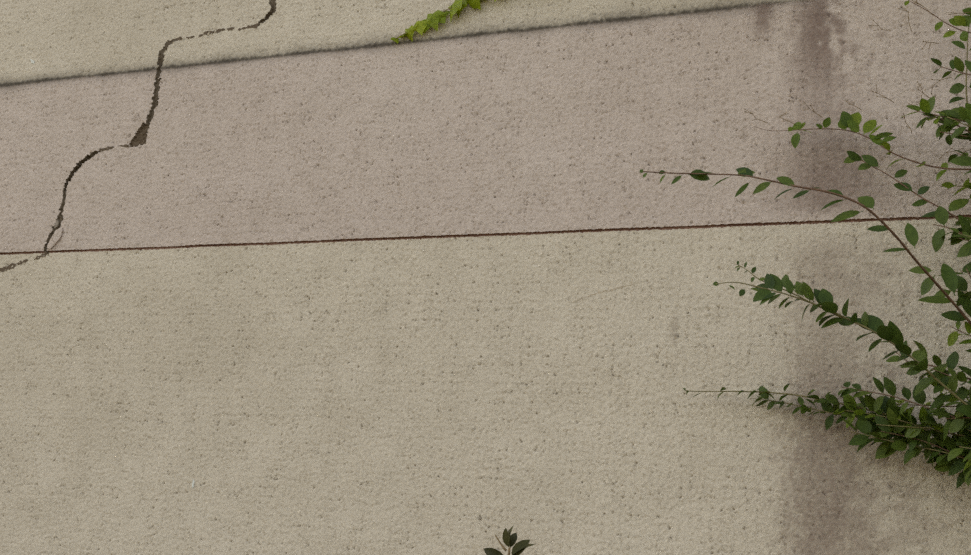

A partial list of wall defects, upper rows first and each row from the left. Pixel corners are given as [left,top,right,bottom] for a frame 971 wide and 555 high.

crack [0,0,277,272]